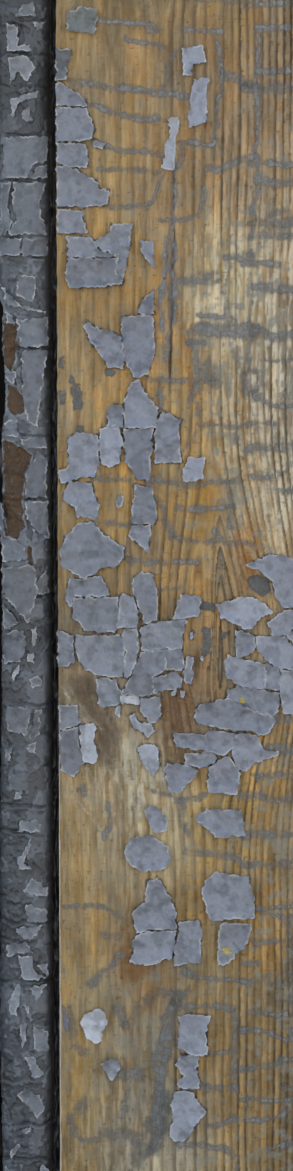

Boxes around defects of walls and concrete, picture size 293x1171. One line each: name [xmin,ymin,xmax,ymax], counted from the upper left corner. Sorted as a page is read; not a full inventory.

peeling [6,2,44,122]
peeling [0,48,157,289]
peeling [65,6,98,35]
peeling [161,45,210,170]
peeling [0,275,293,795]
peeling [124,805,255,966]
peeling [4,819,49,1171]
peeling [80,1008,108,1044]
peeling [101,1058,120,1081]
peeling [170,1012,211,1142]